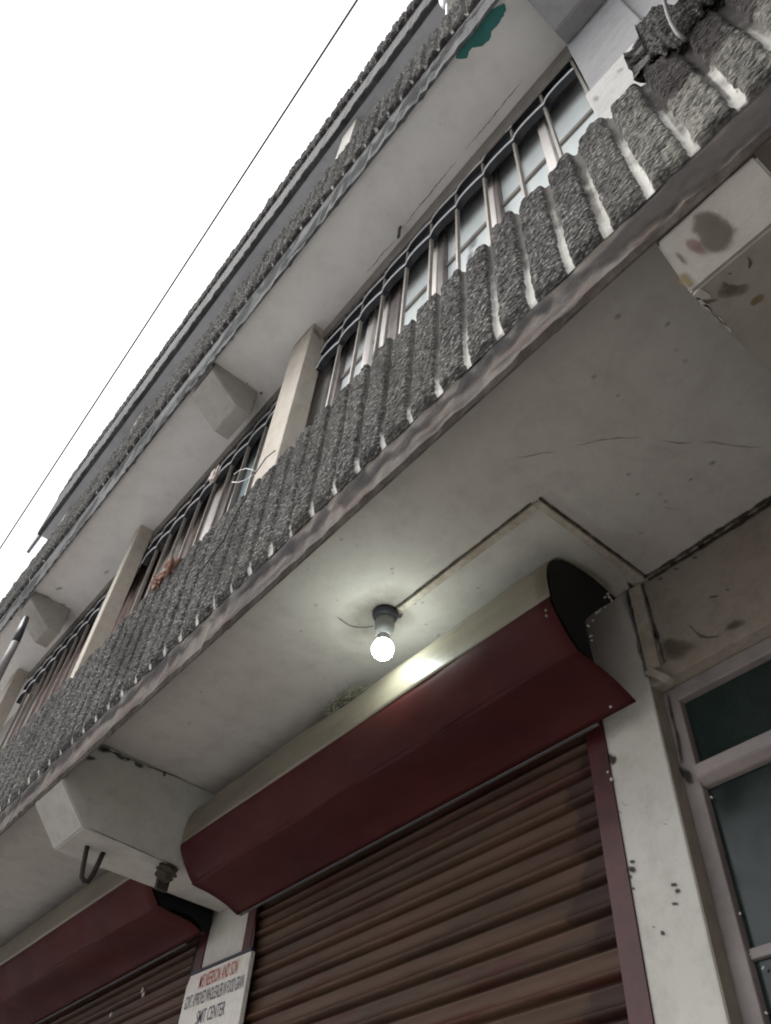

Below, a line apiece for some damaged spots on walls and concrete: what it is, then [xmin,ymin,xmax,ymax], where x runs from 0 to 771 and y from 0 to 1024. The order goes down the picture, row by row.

peeling [446,3,506,68]
damp [567,82,771,287]
damp [212,301,549,620]
damp [0,625,199,821]